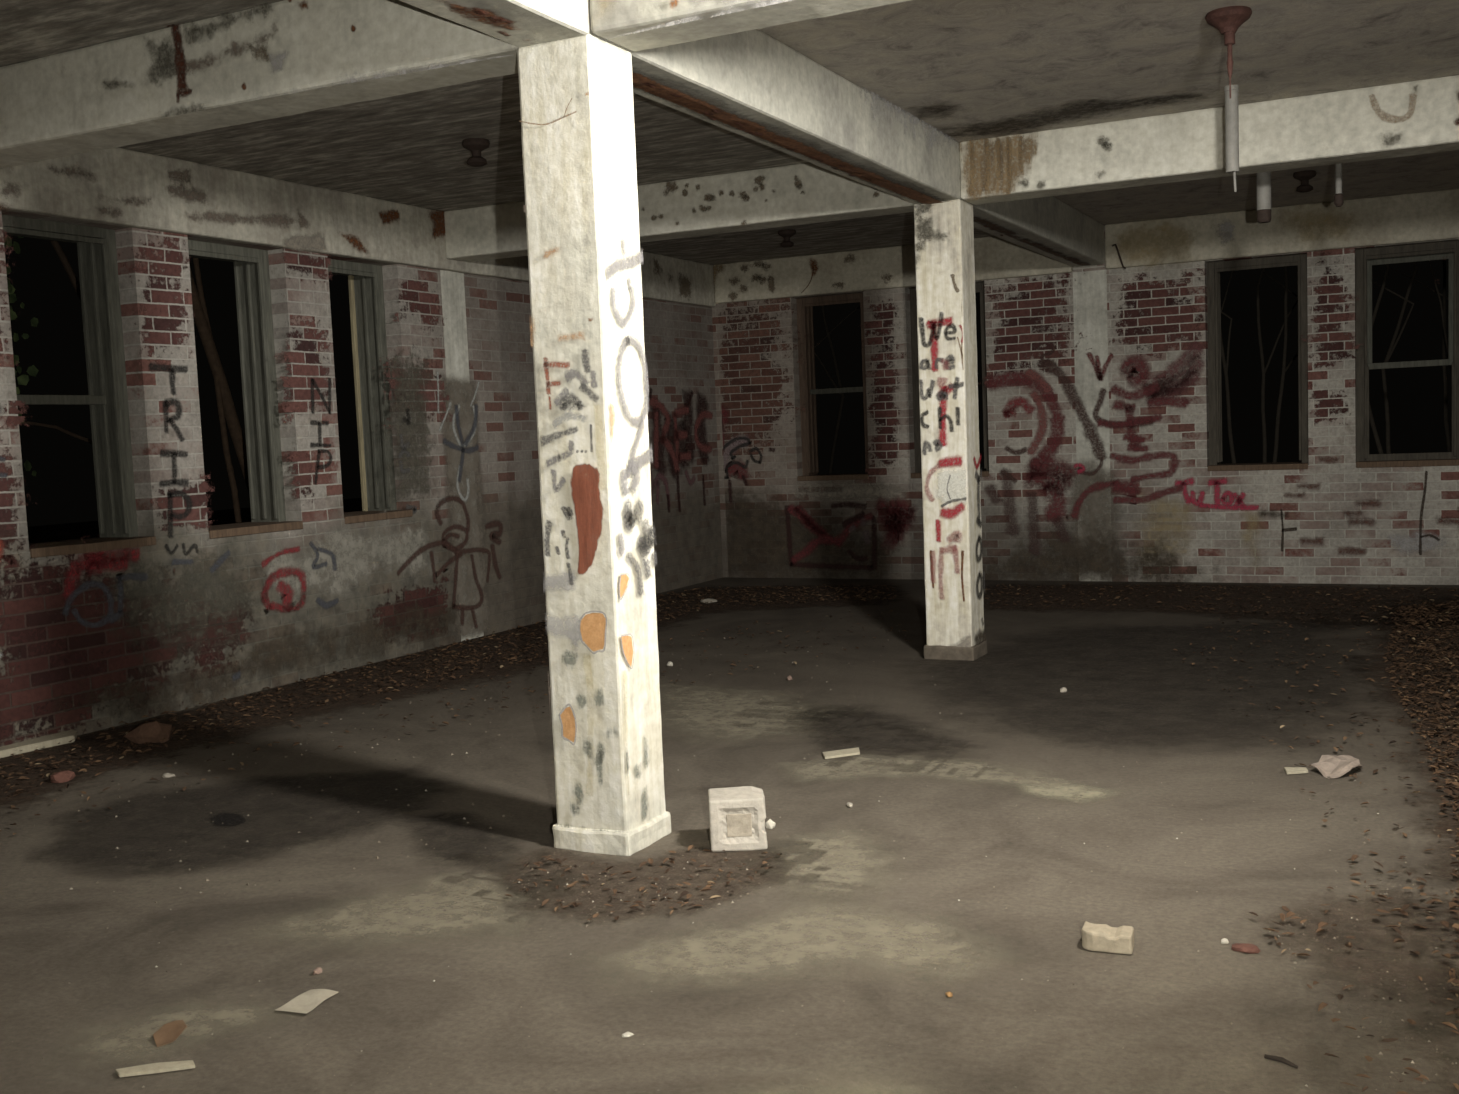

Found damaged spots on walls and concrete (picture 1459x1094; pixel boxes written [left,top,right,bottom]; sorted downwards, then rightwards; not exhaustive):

corrosion [167,24,192,102]
peeling [718,262,812,457]
peeling [973,215,1092,388]
peeling [1109,268,1210,366]